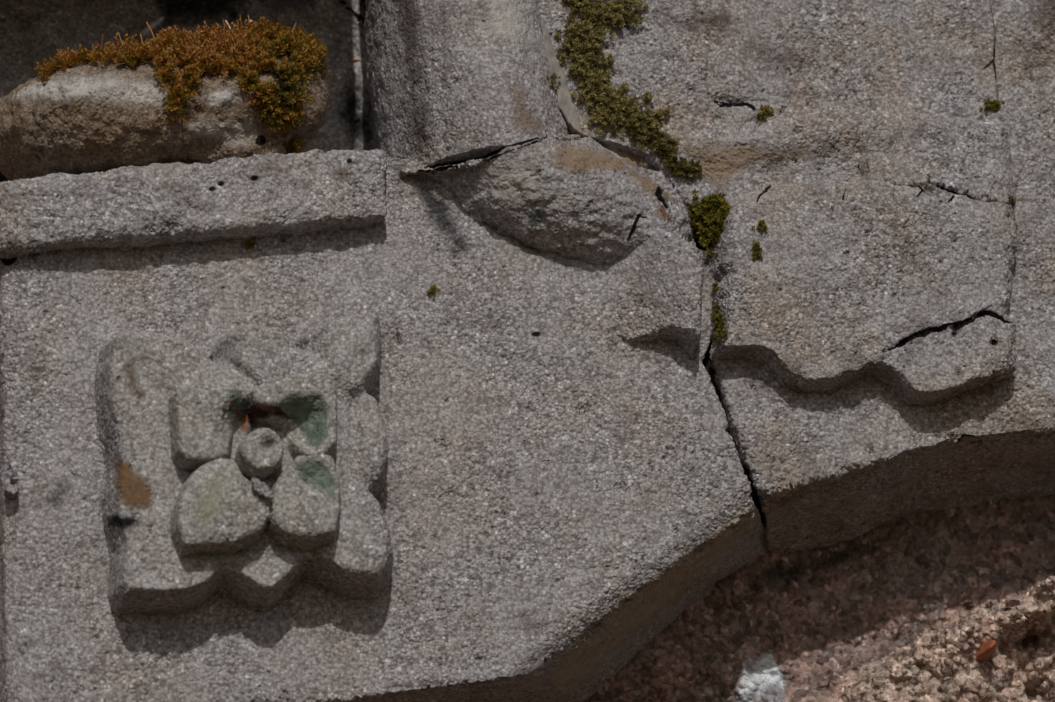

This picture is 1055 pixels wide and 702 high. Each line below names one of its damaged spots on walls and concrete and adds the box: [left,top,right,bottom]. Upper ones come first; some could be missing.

crack [426,137,542,168]
crack [894,184,975,203]
crack [888,304,1010,350]